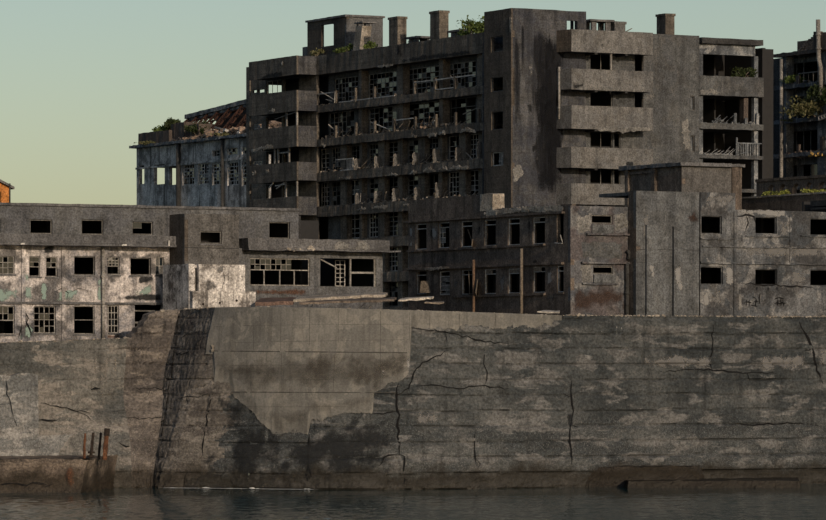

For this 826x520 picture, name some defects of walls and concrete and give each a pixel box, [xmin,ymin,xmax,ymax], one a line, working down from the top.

crack [799,322,823,383]
crack [40,403,94,422]
crack [373,328,509,483]
crack [563,381,577,460]